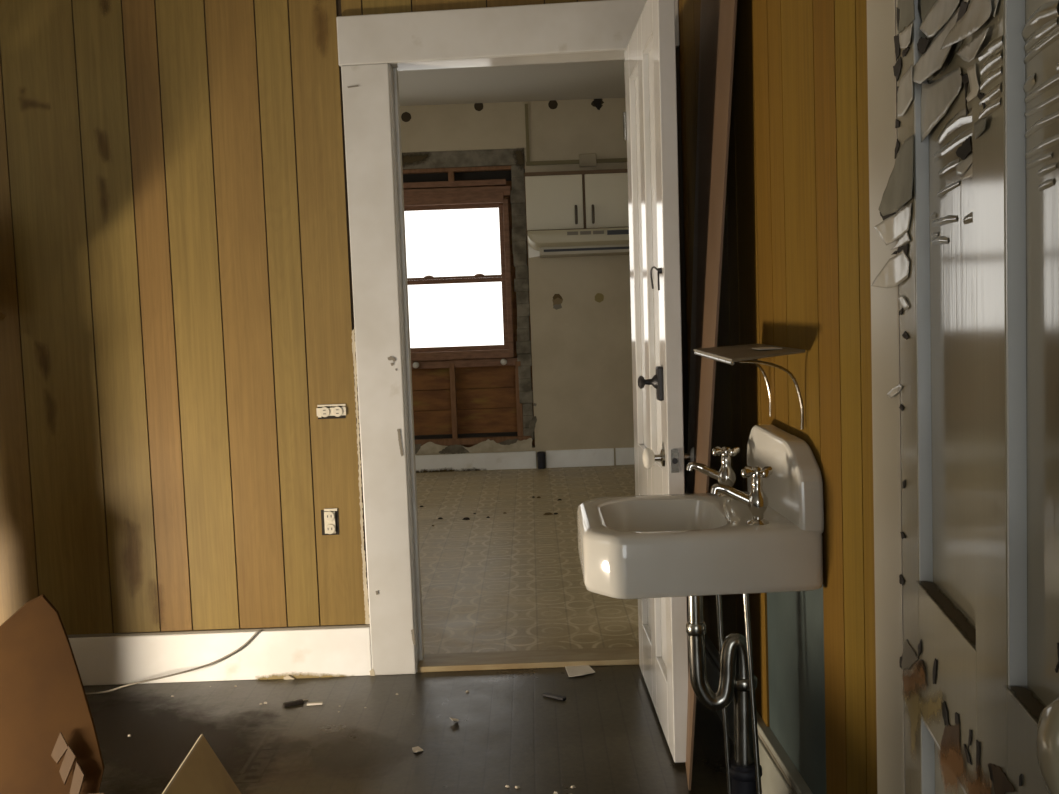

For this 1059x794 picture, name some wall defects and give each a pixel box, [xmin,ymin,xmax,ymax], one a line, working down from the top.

peeling [871,0,999,288]
spalling [397,403,537,457]
peeling [899,639,937,684]
peeling [939,701,1022,794]